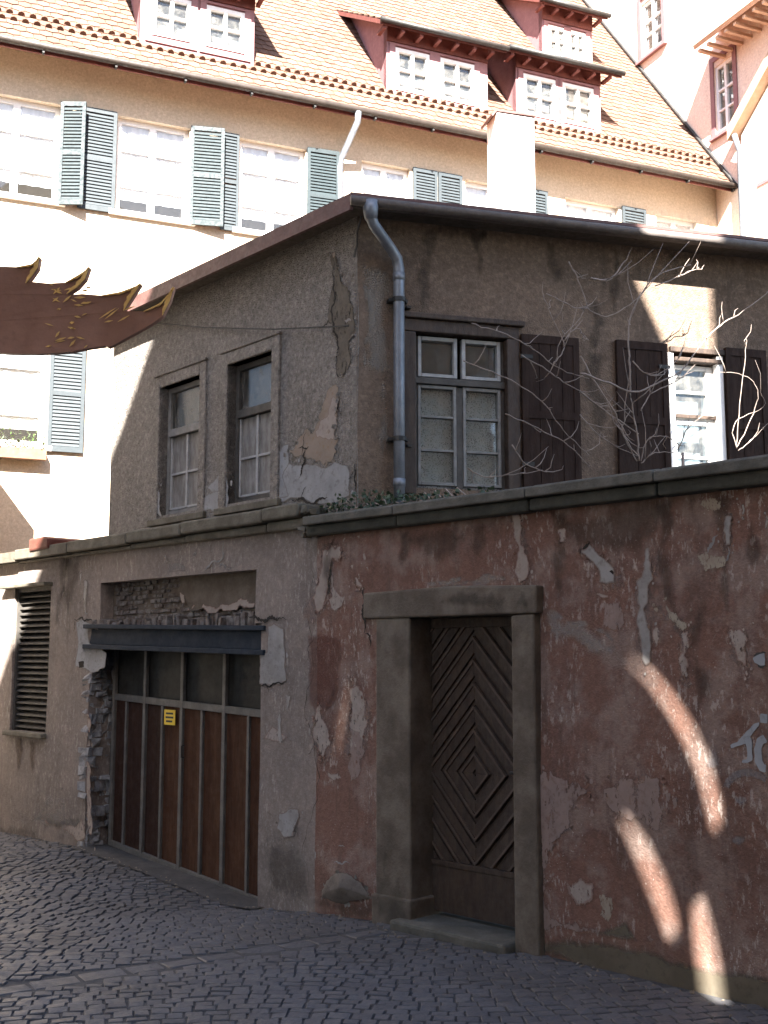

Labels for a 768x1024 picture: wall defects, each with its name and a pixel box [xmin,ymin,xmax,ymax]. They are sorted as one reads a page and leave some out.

crack [324,261,339,374]
spalling [279,242,359,498]
flaking render [114,578,255,620]
peeling [506,514,533,585]
spalling [558,528,628,631]
peeling [697,497,744,572]
peeling [306,677,373,783]
spalling [275,808,303,847]
peeling [540,765,677,939]